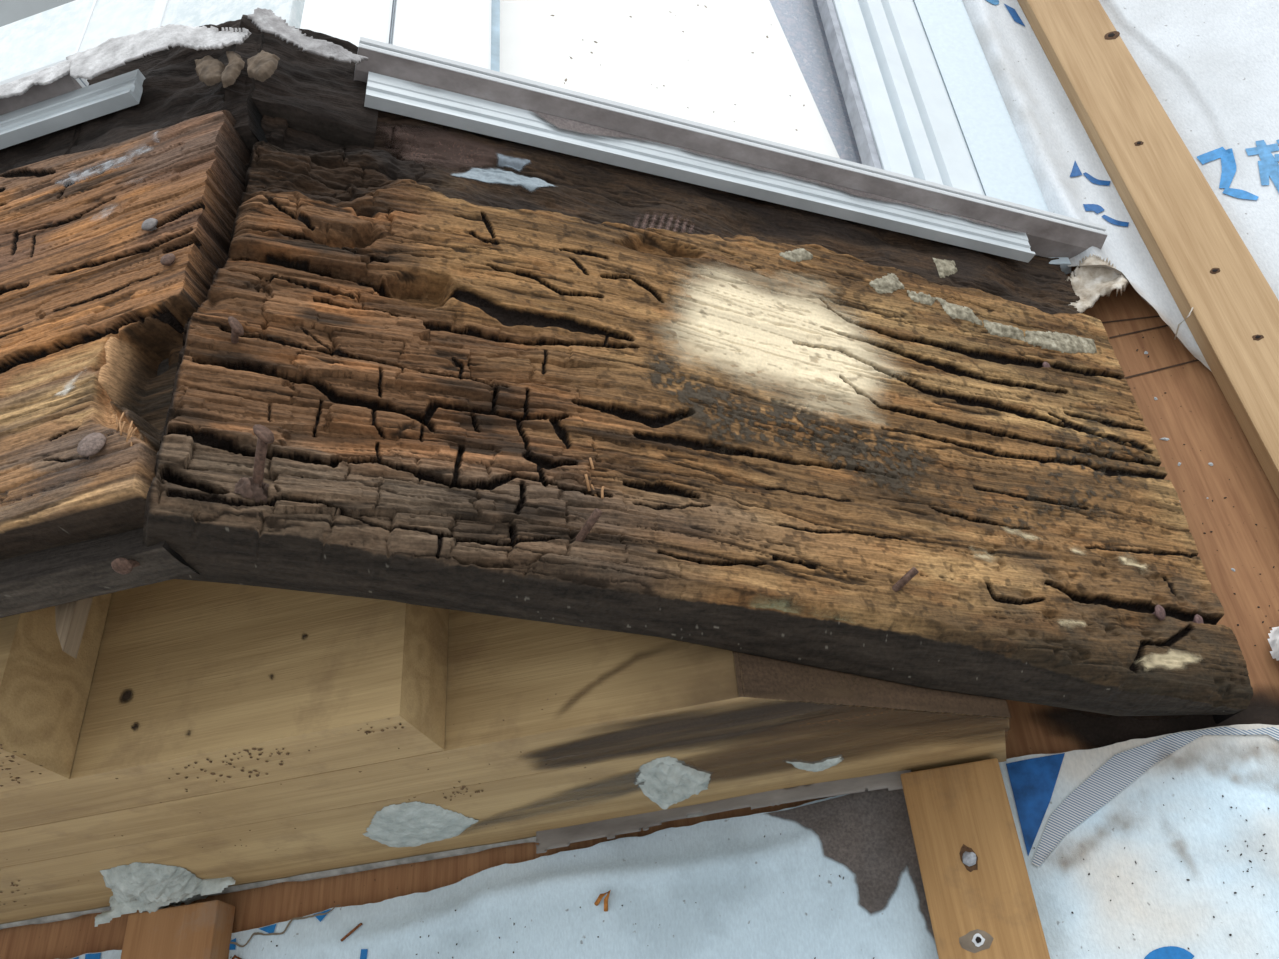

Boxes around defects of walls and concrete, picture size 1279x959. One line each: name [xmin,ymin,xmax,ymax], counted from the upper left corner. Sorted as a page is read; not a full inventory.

crack [0,170,115,295]
crack [0,197,906,570]
crack [801,309,1165,479]
crack [931,487,1088,530]
leakage [527,651,1011,782]
crack [986,546,1222,673]
leakage [1042,693,1279,750]
leakage [1145,652,1196,668]